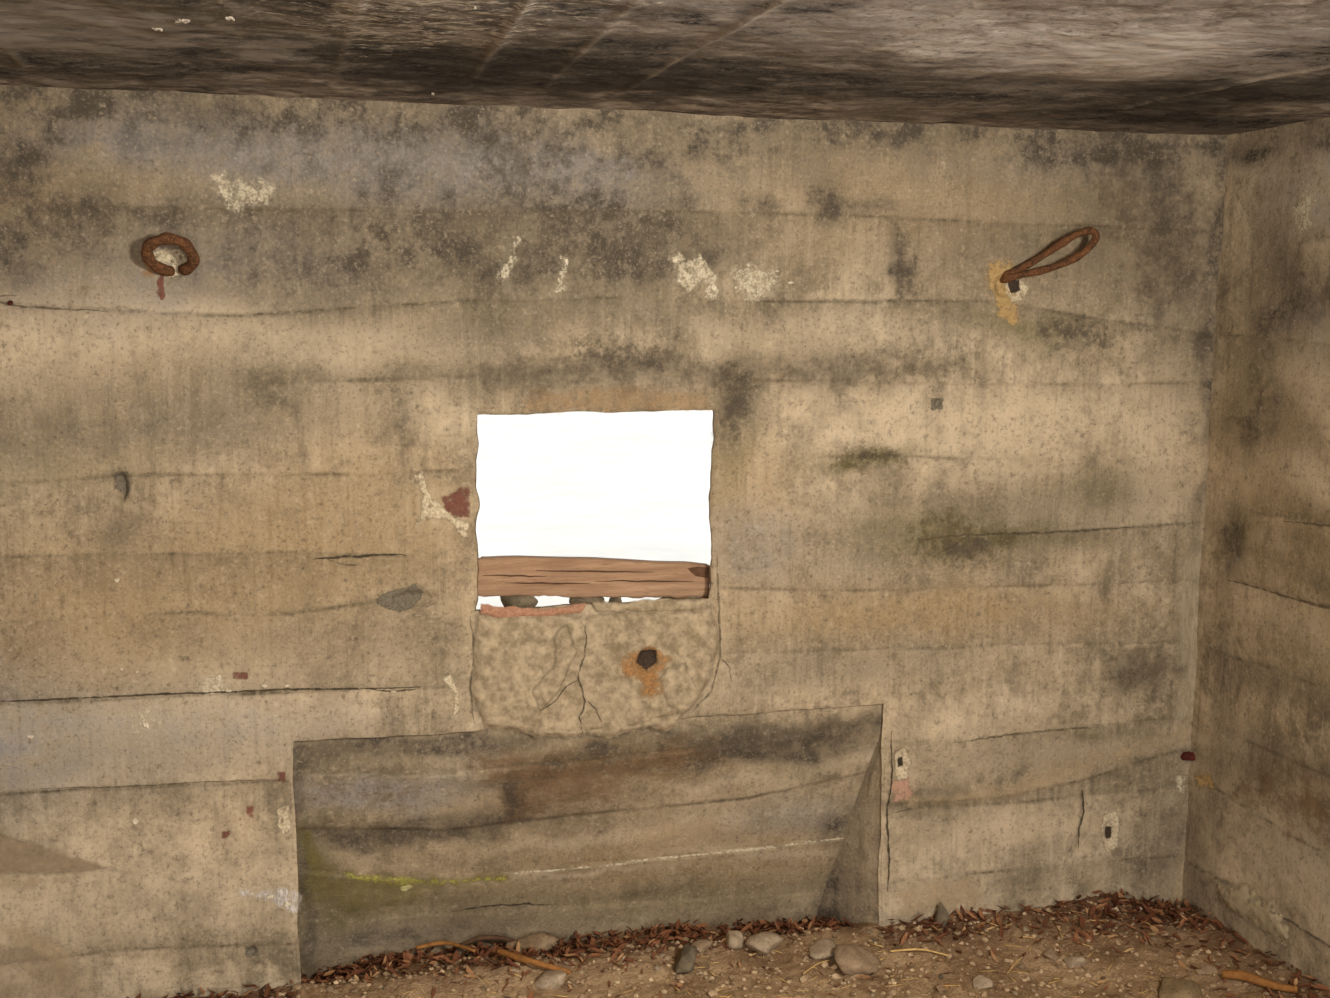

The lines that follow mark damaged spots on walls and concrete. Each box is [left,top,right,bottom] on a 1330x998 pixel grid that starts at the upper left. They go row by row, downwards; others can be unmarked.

damp [0,0,620,62]
damp [982,31,1261,68]
corrosion [143,264,165,300]
corrosion [986,260,1019,325]
spalling [414,473,469,537]
crack [694,555,732,710]
crack [468,616,476,720]
crack [541,626,602,735]
corrosion [620,647,671,697]